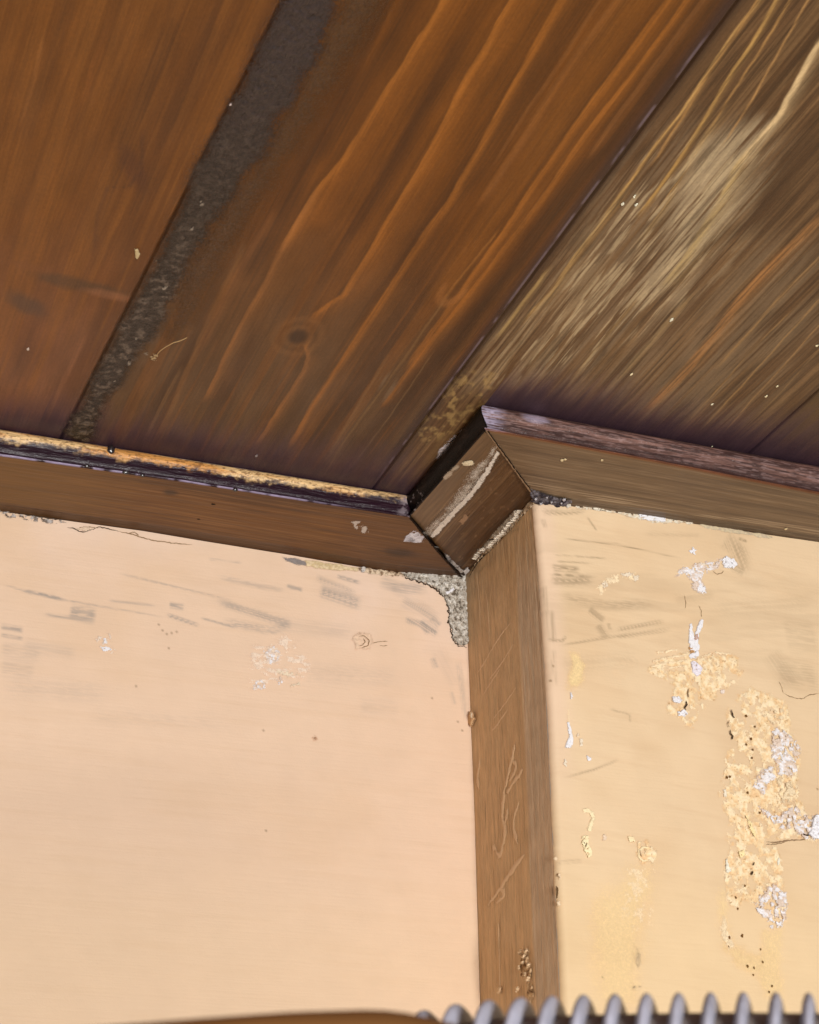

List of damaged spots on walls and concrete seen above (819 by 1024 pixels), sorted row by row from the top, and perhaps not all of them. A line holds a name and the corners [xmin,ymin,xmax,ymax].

damp [58,0,405,444]
peeling [689,634,703,676]